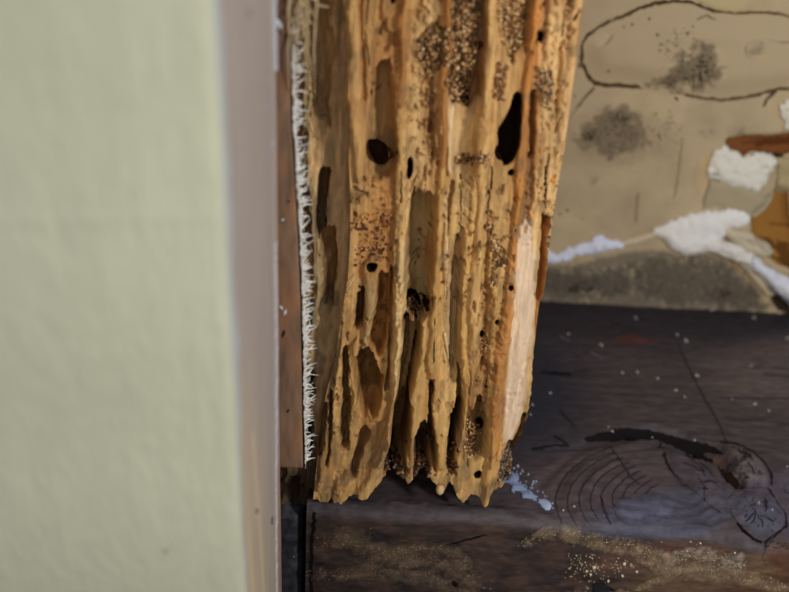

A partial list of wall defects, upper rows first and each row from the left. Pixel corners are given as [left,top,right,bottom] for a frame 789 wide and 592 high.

crack [569,0,789,118]
leakage [639,25,729,101]
peeling [779,99,789,130]
peeling [548,144,789,314]
leakage [540,248,776,313]
leakage [504,467,553,510]